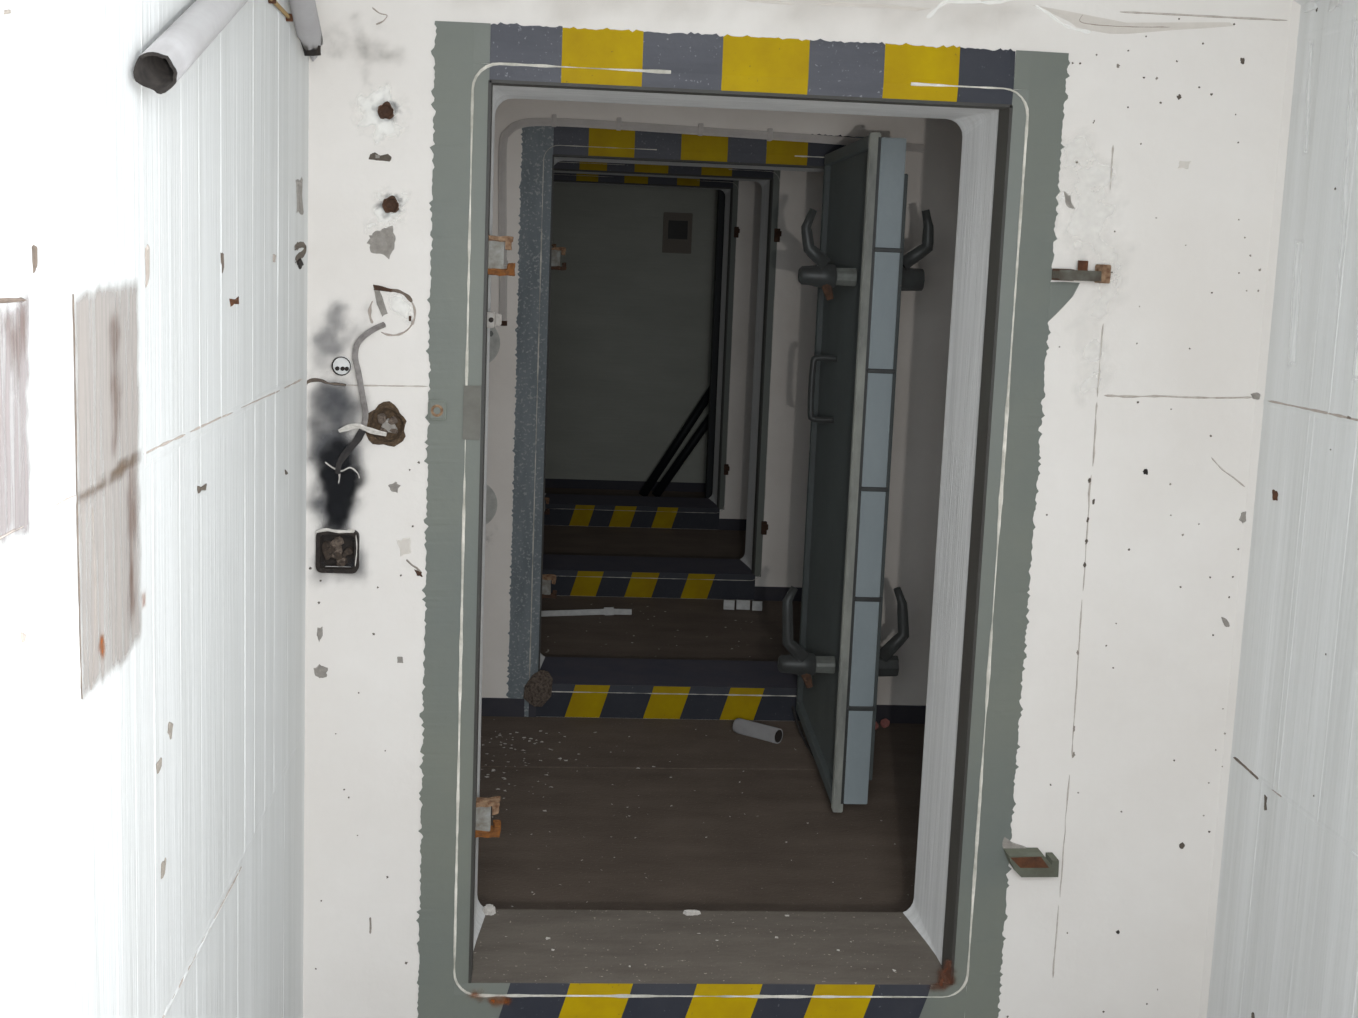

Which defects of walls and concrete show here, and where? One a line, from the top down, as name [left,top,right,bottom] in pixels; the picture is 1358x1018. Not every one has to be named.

spalling [358,87,397,162]
spalling [367,196,401,259]
rust [1011,857,1049,868]